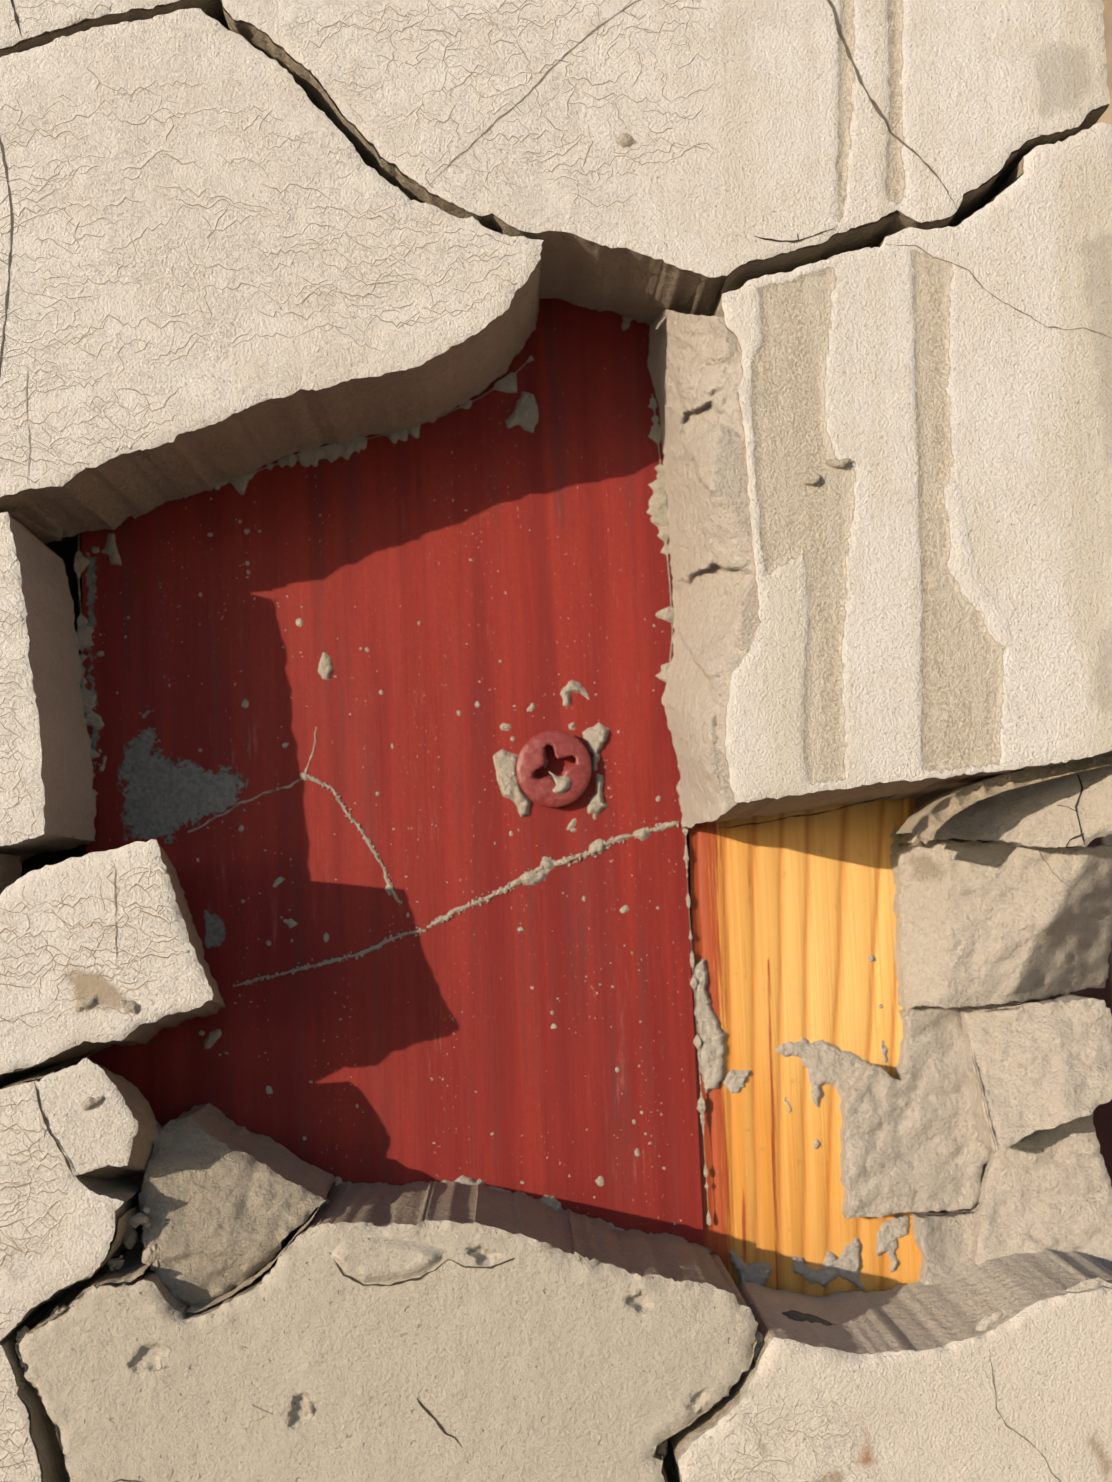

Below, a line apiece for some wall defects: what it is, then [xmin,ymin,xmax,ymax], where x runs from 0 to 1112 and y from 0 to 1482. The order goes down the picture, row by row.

peeling [835,0,855,222]
peeling [885,0,906,204]
crack [713,0,1111,338]
crack [0,0,723,836]
spalling [647,267,856,828]
peeling [117,709,249,844]
spalling [839,249,1112,1292]
crack [0,864,188,1482]
spalling [125,1342,171,1374]
crack [186,1198,515,1317]
crack [417,1398,462,1447]
crack [654,1303,860,1482]